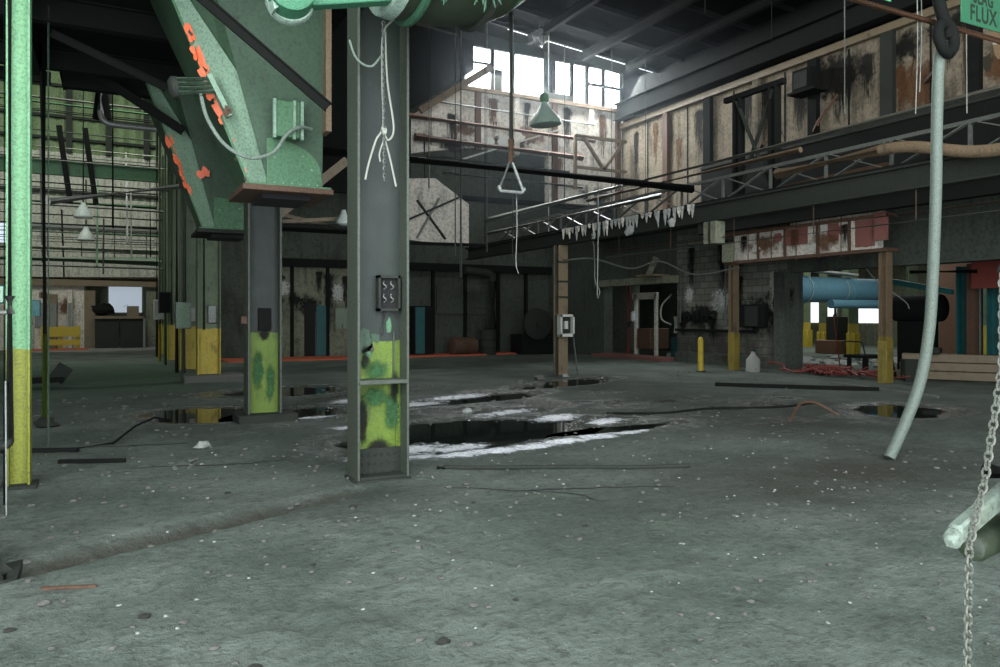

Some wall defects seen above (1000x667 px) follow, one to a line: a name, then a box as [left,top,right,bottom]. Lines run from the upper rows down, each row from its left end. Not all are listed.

spalling [983,30,1000,72]
damp [820,50,875,121]
damp [794,97,807,128]